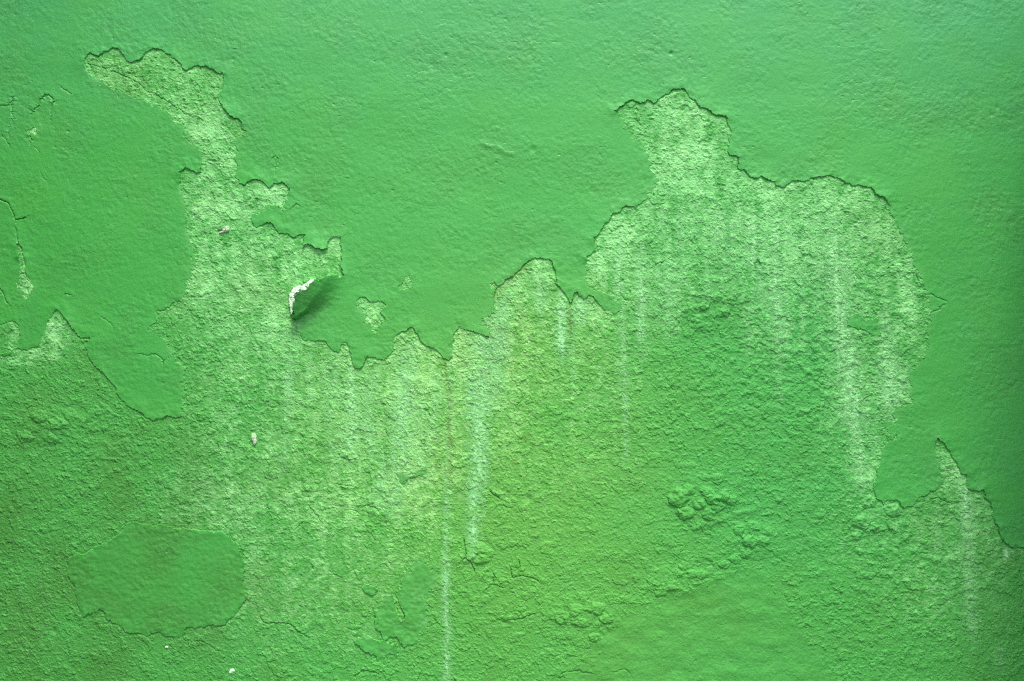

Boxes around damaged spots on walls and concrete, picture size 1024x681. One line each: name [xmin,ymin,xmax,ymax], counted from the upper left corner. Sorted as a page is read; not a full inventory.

peeling [0,45,623,533]
water stain [469,340,503,543]
water stain [557,299,586,352]
peeling [584,86,1024,658]
water stain [826,225,865,480]